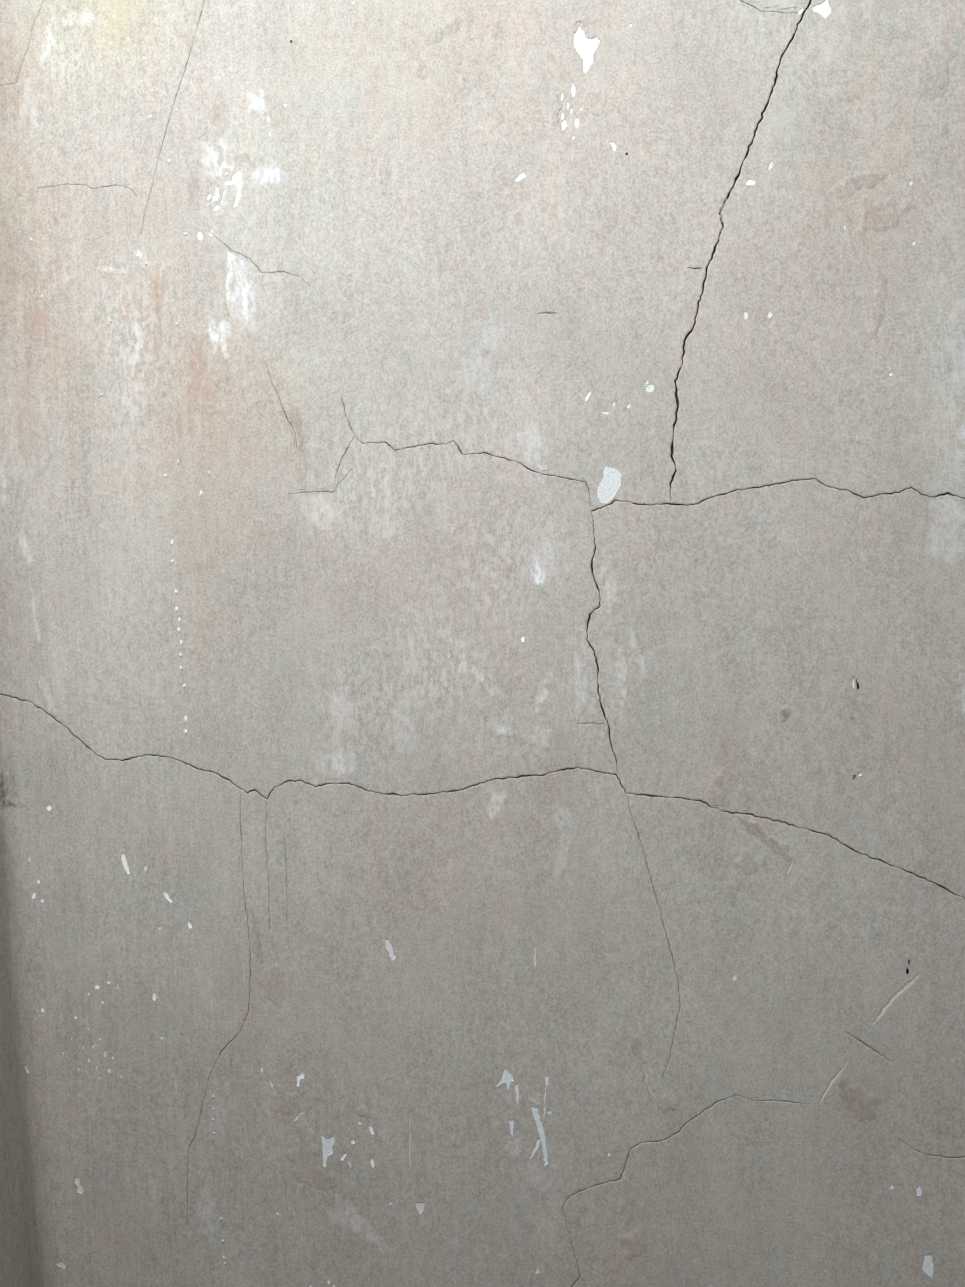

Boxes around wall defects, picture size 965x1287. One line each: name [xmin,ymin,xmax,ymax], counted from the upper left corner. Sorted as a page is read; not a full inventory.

peeling [798,0,830,18]
crack [38,0,206,235]
peeling [560,25,600,139]
crack [210,231,311,288]
crack [265,362,298,451]
crack [289,397,591,507]
crack [585,0,965,773]
crack [0,693,965,1079]
crack [186,792,252,1221]
peeling [321,1135,355,1168]
peeling [496,1068,551,1166]
crack [562,1094,810,1287]